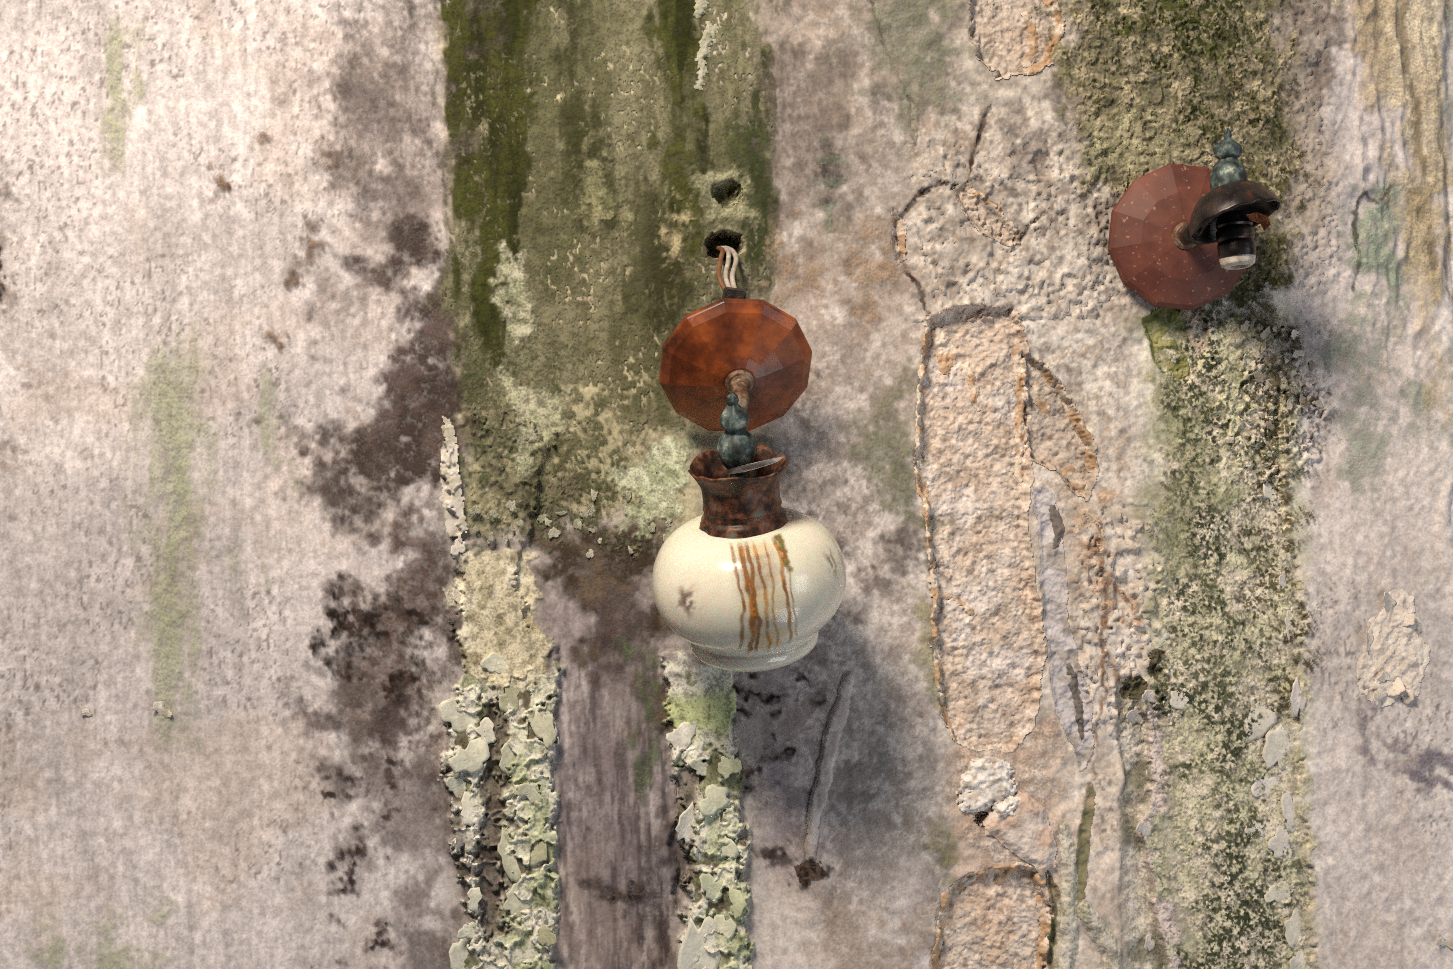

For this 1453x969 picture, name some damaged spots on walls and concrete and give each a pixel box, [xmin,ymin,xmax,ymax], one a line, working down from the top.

crack [900,107,991,218]
water stain [284,225,323,289]
crack [904,265,925,310]
crack [1020,211,1045,241]
water stain [297,0,701,969]
peeling [439,416,602,558]
peeling [1356,589,1430,708]
peeling [437,633,565,969]
peeling [661,651,755,969]